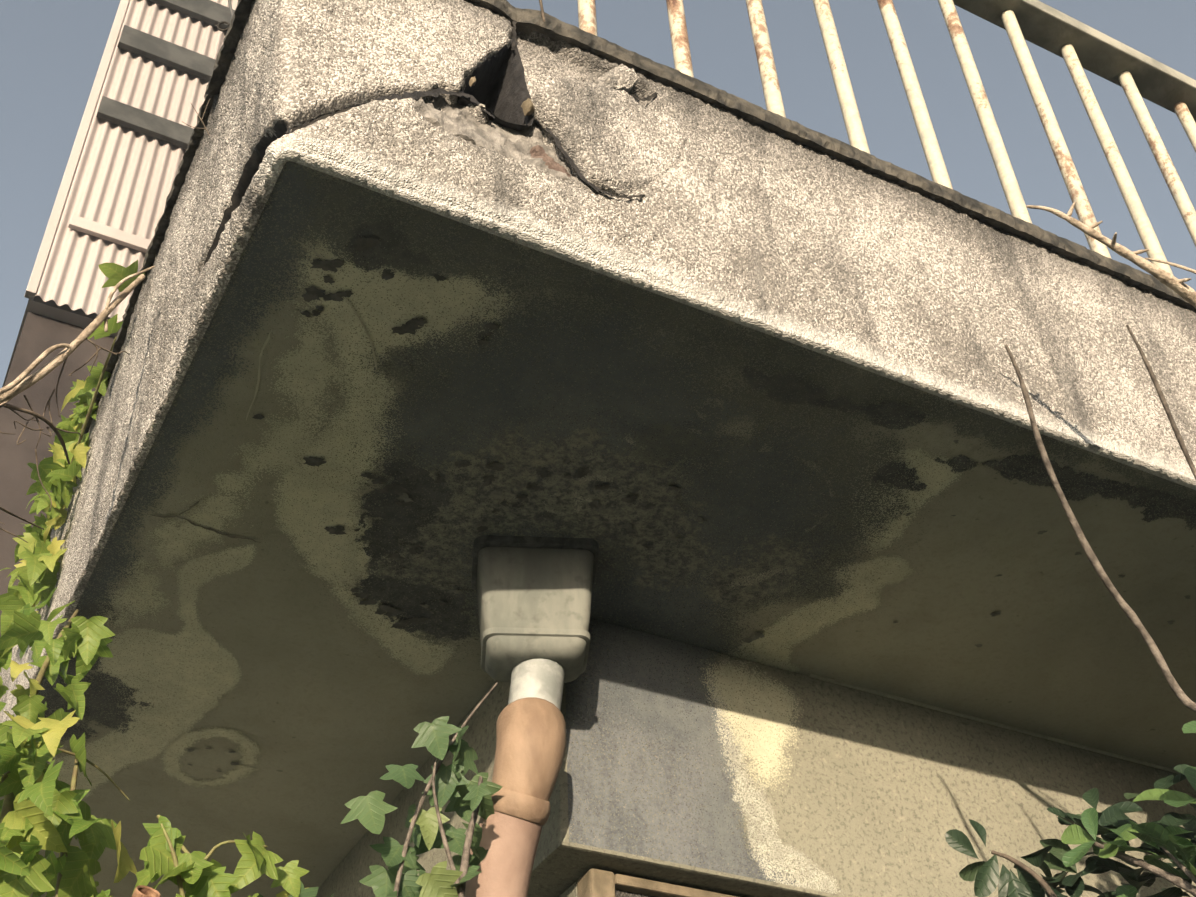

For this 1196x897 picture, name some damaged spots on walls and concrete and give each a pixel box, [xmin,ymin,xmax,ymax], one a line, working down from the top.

crack [204,99,392,265]
spalling [372,38,687,196]
crack [605,192,645,200]
crack [631,92,658,101]
peeling [48,220,518,799]
leakage [38,161,1196,896]
peeling [729,440,1196,673]